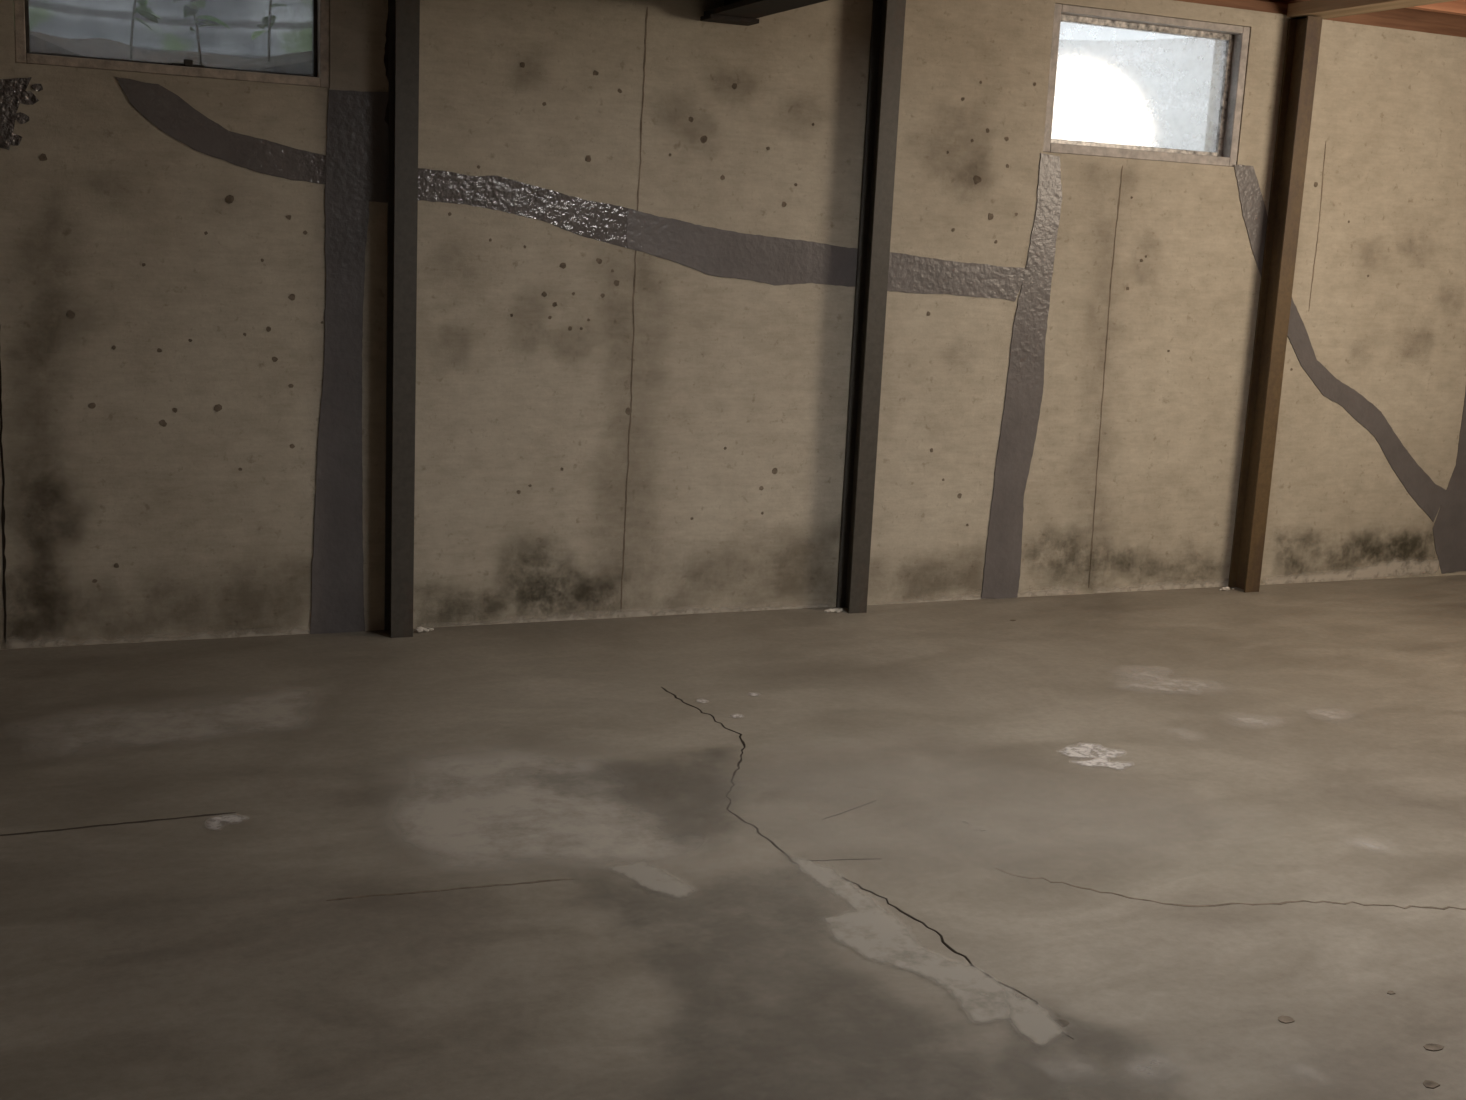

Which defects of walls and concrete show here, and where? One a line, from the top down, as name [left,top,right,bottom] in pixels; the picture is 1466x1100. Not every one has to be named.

crack [0,77,43,150]
crack [1234,165,1268,276]
crack [115,77,1062,634]
crack [1287,299,1466,574]
crack [0,360,8,642]
leakage [9,629,309,649]
leakage [441,603,828,625]
leakage [1097,581,1229,593]
leakage [1265,539,1439,584]
crack [661,687,1038,1005]
crack [996,868,1466,910]